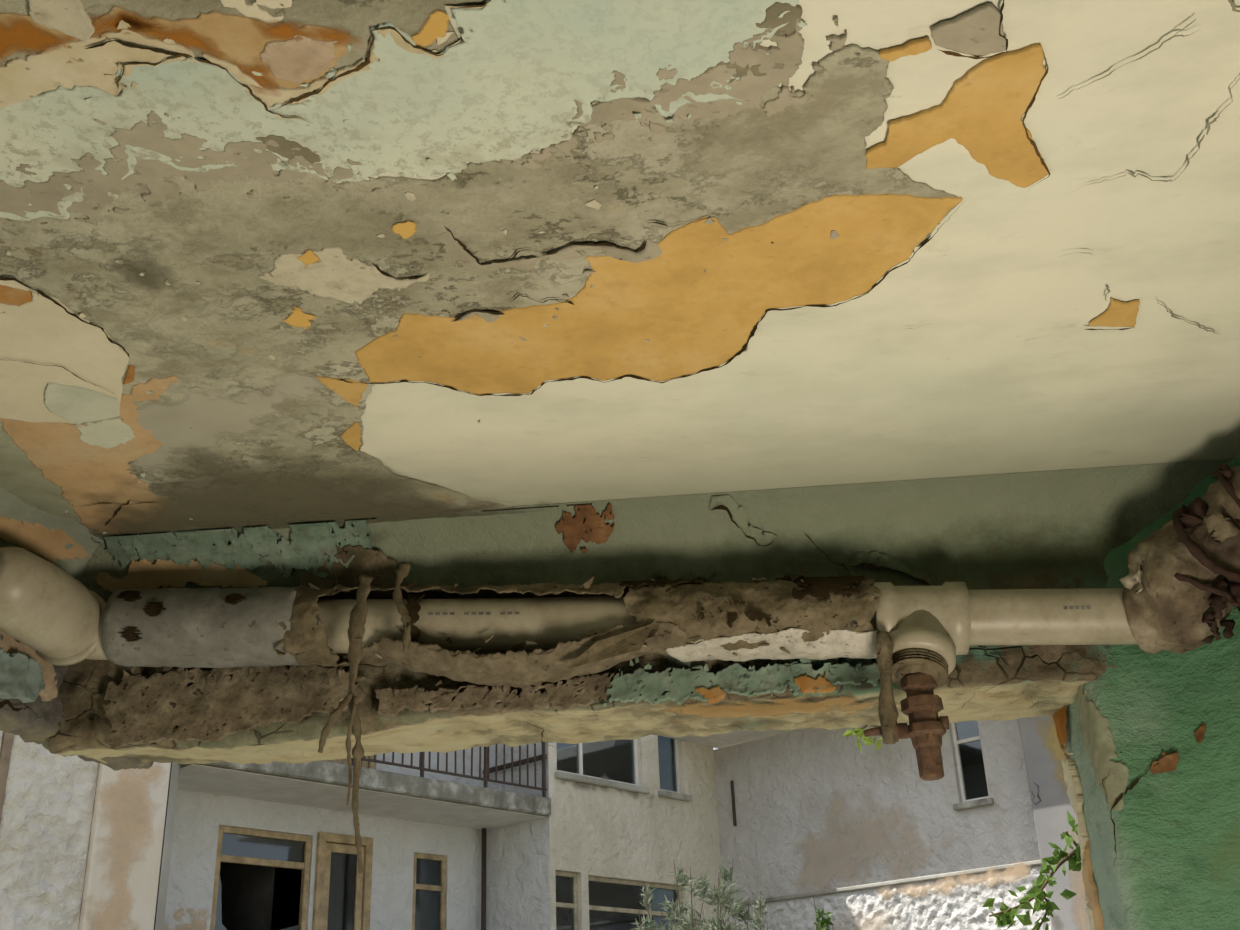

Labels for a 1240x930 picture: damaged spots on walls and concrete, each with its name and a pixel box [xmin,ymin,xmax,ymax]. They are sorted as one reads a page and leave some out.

crack [999,0,1008,52]
crack [1059,19,1200,99]
crack [1228,0,1240,12]
crack [1073,78,1240,192]
flaking render [0,0,1050,599]
crack [369,216,713,322]
peeling [1085,298,1140,330]
flaking render [0,631,58,702]
flaking render [103,657,880,750]
peeling [1061,684,1130,930]